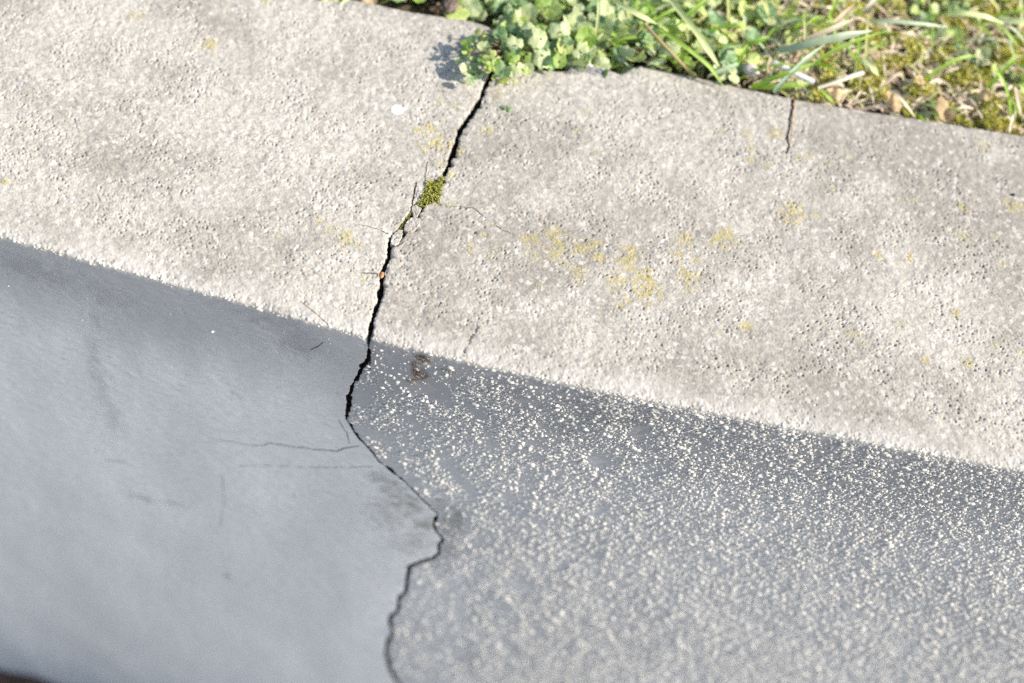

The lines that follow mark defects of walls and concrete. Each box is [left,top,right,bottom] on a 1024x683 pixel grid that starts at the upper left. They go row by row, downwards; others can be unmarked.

crack [786,99,796,154]
crack [220,27,511,527]
crack [386,564,412,674]